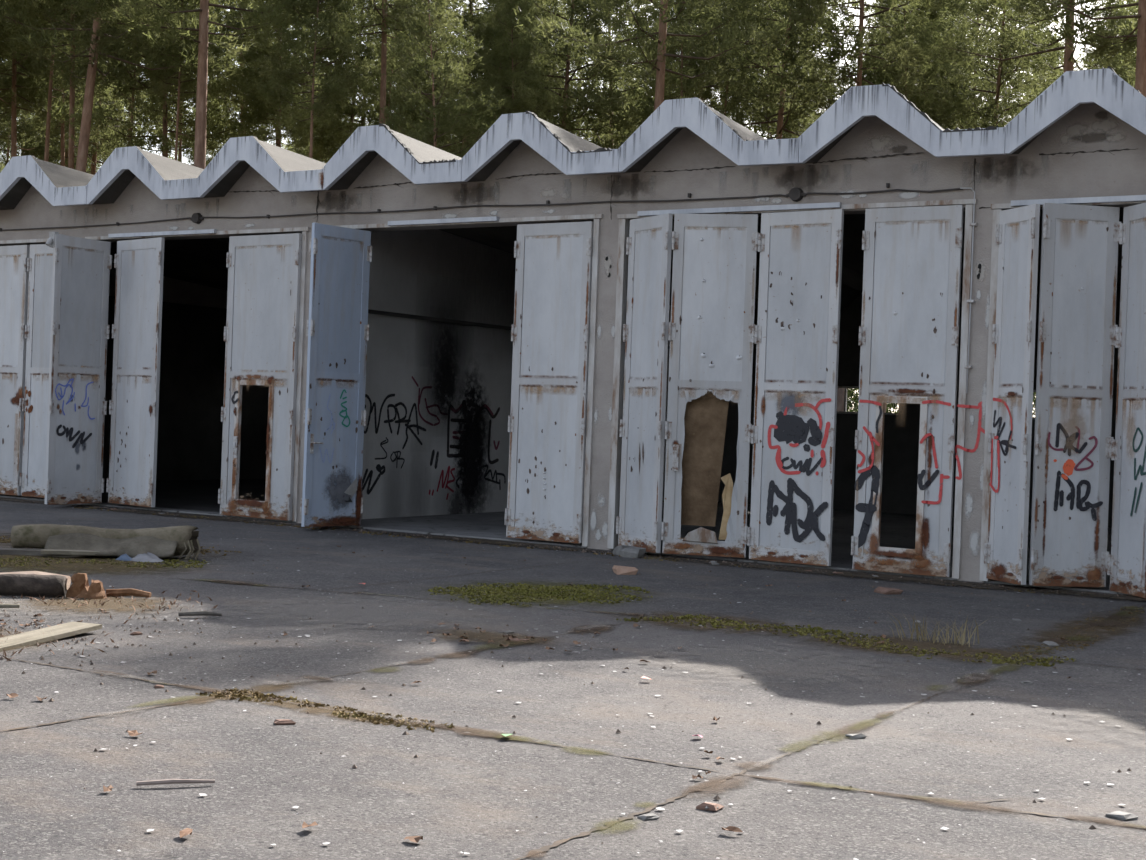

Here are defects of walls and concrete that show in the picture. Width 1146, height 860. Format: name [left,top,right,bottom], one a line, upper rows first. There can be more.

rust [11,386,33,471]
leakage [430,322,485,507]
rust [860,379,939,401]
rust [0,481,151,507]
rust [221,462,288,521]
rust [508,519,578,544]
rust [854,518,947,577]
rust [1035,498,1047,553]
rust [987,560,1146,601]
crack [0,656,443,731]
crack [868,663,1017,722]
crack [514,733,1146,860]